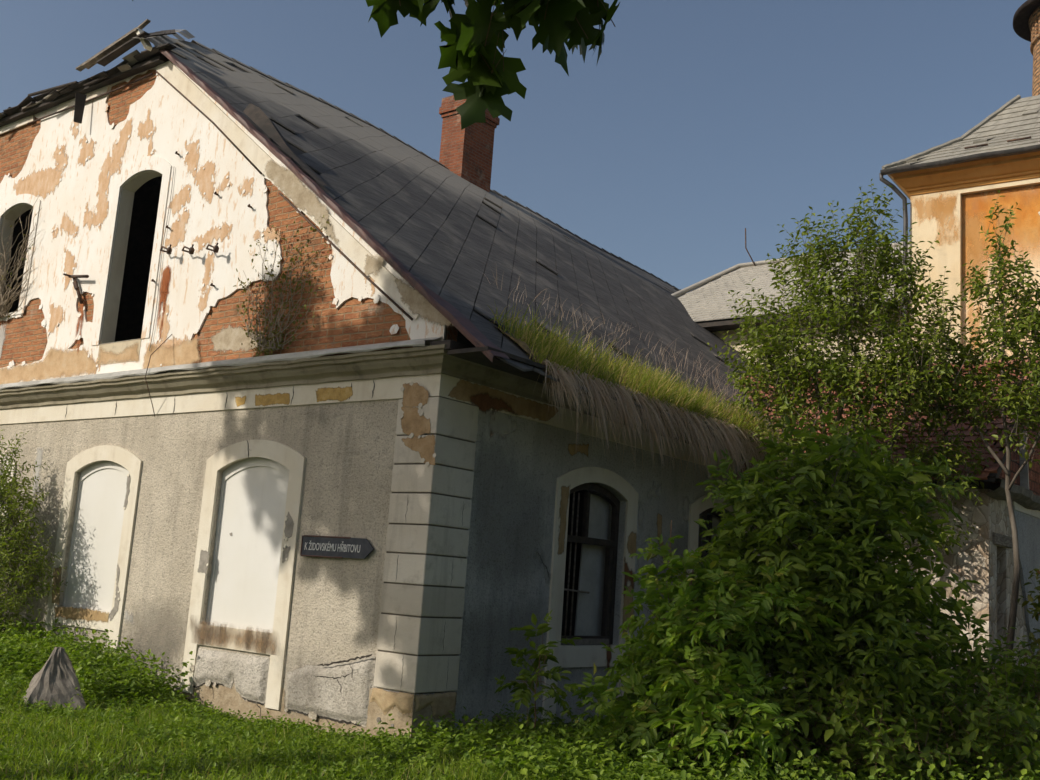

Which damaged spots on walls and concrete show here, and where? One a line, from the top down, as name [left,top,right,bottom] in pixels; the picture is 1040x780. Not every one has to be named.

flaking render [0,69,158,290]
flaking render [147,140,413,370]
leakage [910,184,1040,292]
flaking render [0,298,65,368]
flaking render [70,335,100,374]
flaking render [78,291,94,322]
rust [158,267,170,337]
leakage [968,310,979,349]
flaking render [399,381,436,466]
leakage [195,624,275,654]
crack [317,617,404,694]
crack [193,682,361,726]